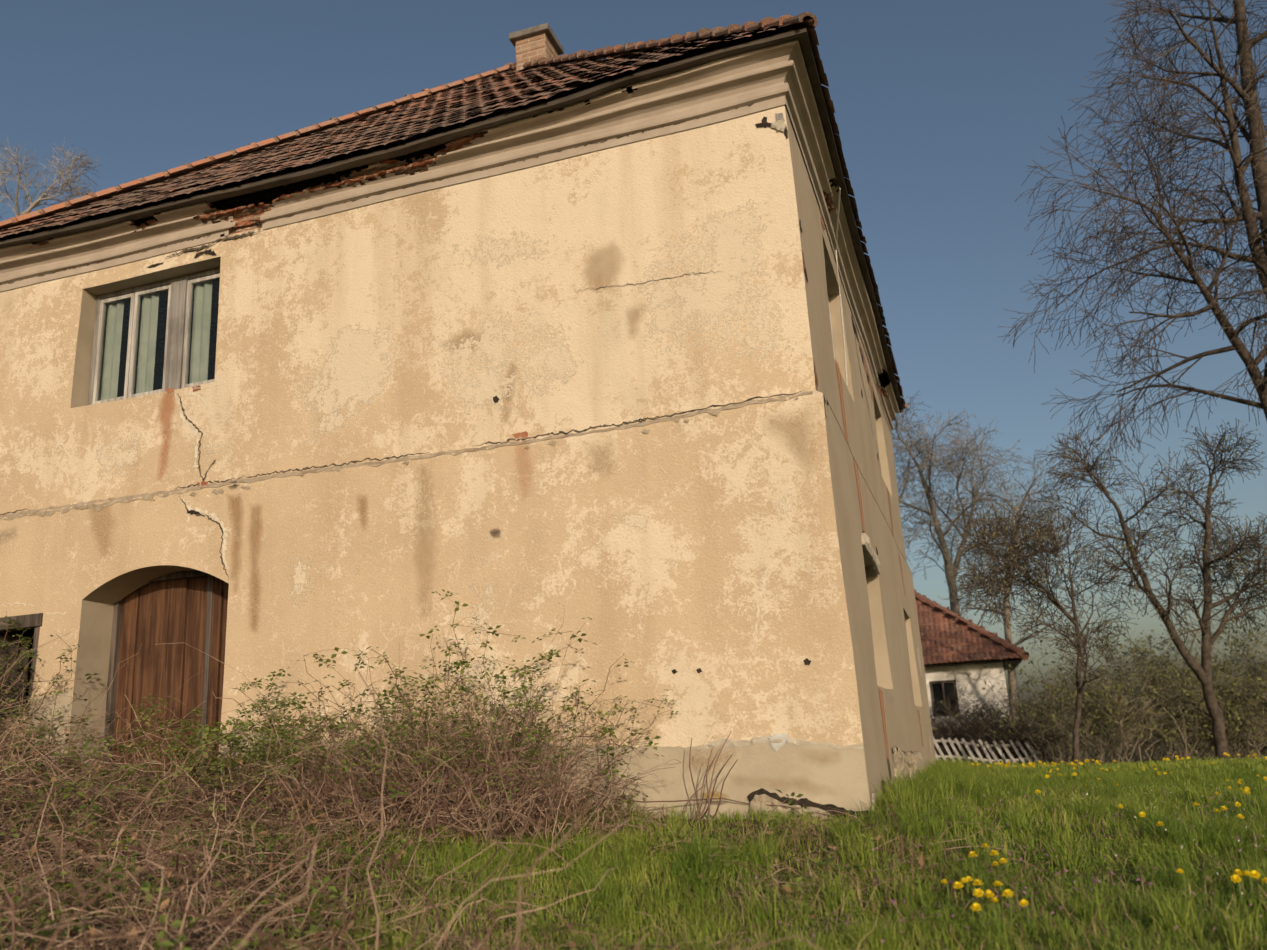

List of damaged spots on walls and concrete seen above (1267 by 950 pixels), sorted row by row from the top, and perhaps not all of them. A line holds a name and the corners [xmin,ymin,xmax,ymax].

crack [475,390,804,446]
crack [174,391,430,580]
corrosion [232,499,259,593]